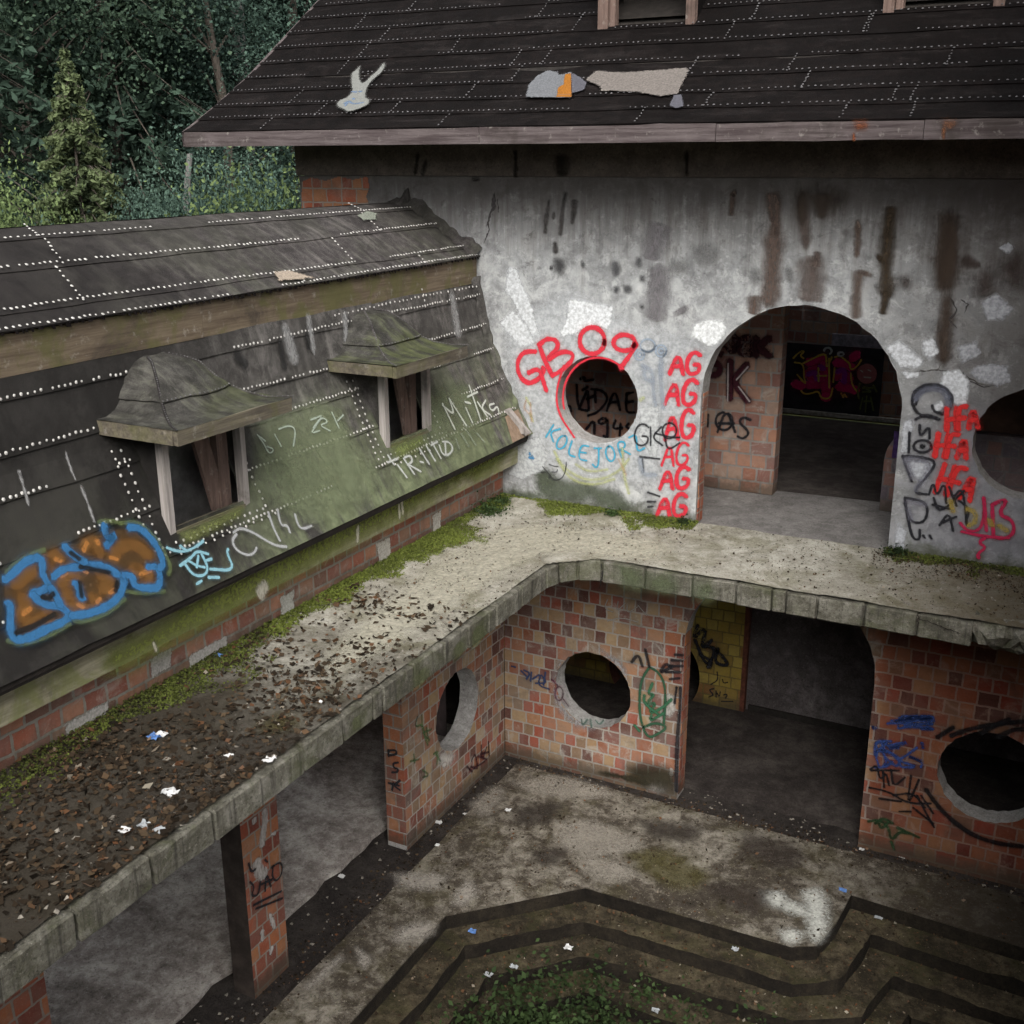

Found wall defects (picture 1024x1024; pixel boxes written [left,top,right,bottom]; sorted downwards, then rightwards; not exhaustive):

crack [484,194,499,242]
water stain [544,193,578,274]
water stain [748,191,842,315]
water stain [852,206,909,318]
water stain [936,212,993,365]
spalling [972,610,1024,655]